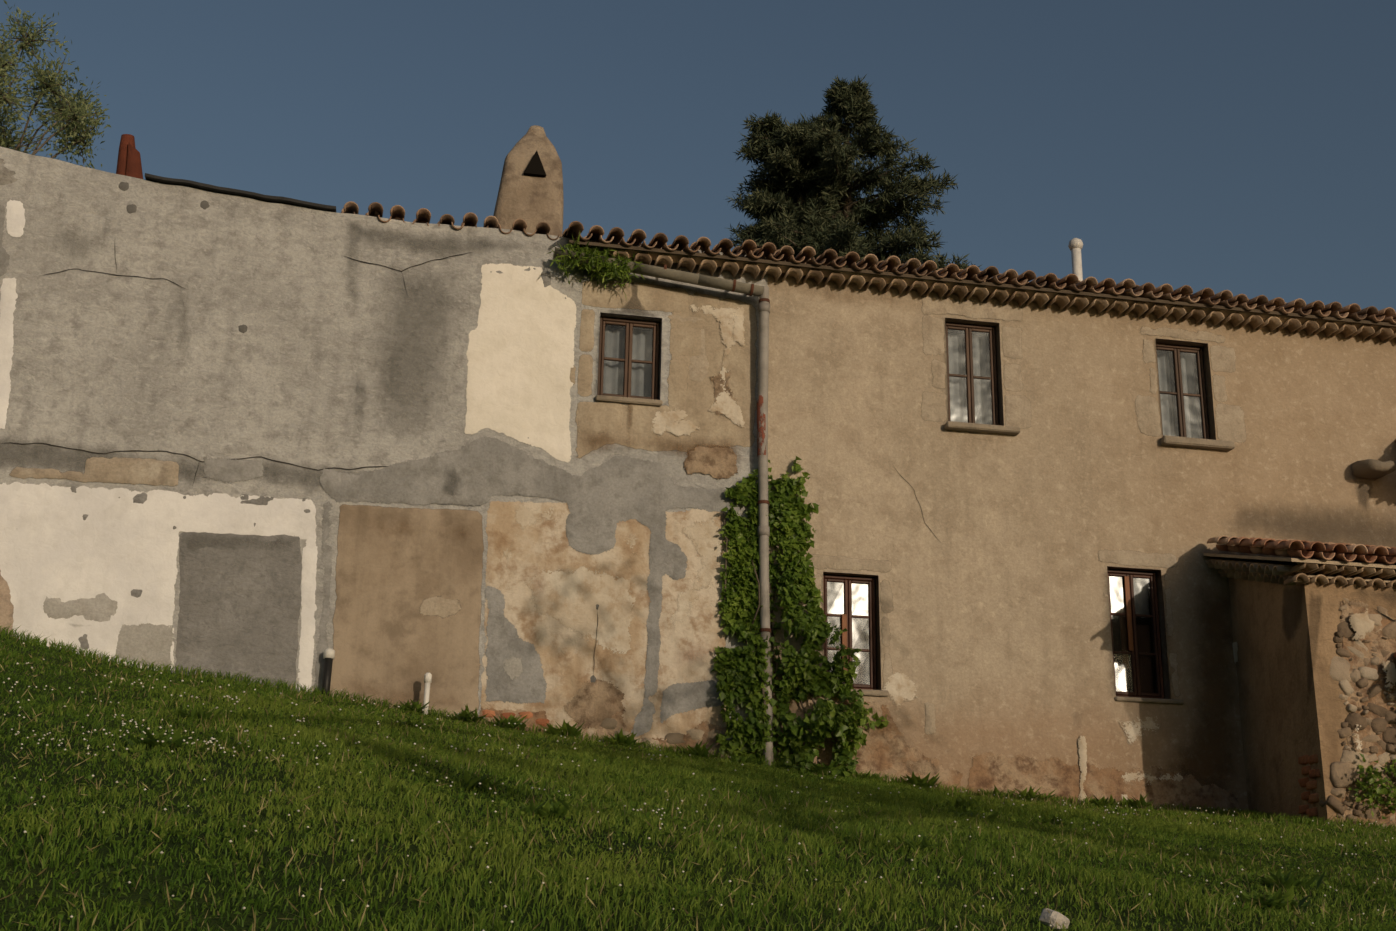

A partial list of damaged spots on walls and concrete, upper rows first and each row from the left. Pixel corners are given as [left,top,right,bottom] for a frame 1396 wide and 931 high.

peeling [690,304,746,428]
spalling [651,408,738,479]
peeling [0,482,318,691]
peeling [420,596,462,618]
peeling [479,501,733,760]